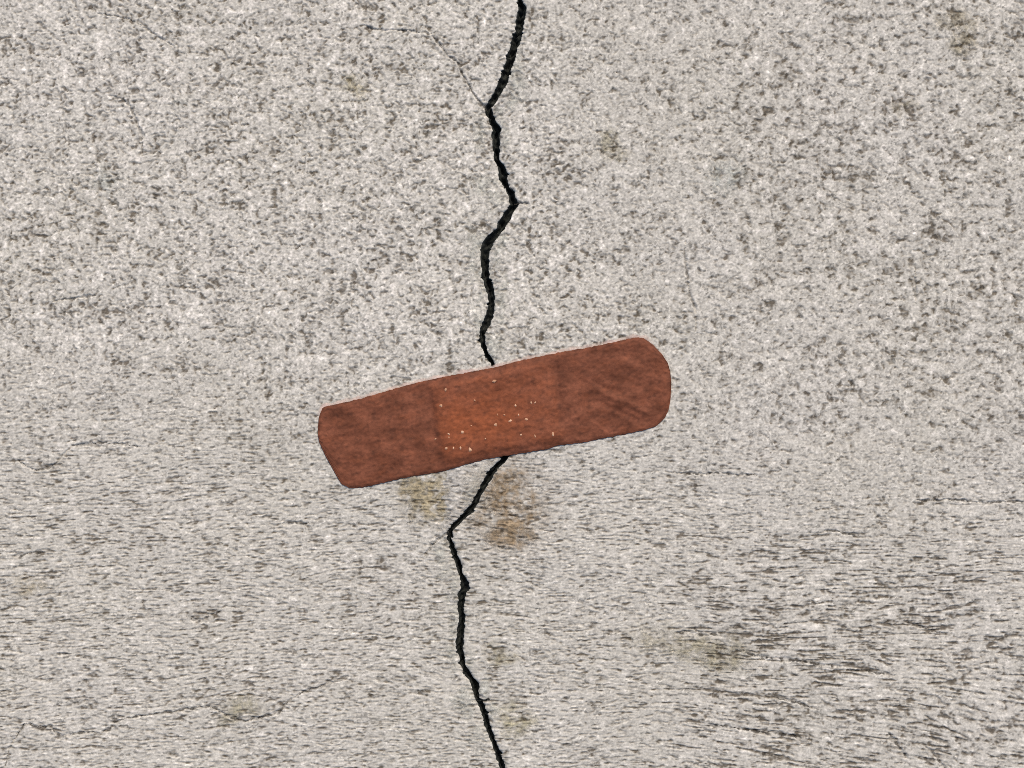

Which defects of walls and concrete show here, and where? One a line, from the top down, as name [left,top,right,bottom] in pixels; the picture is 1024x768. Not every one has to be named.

crack [434,0,527,367]
crack [436,455,510,768]